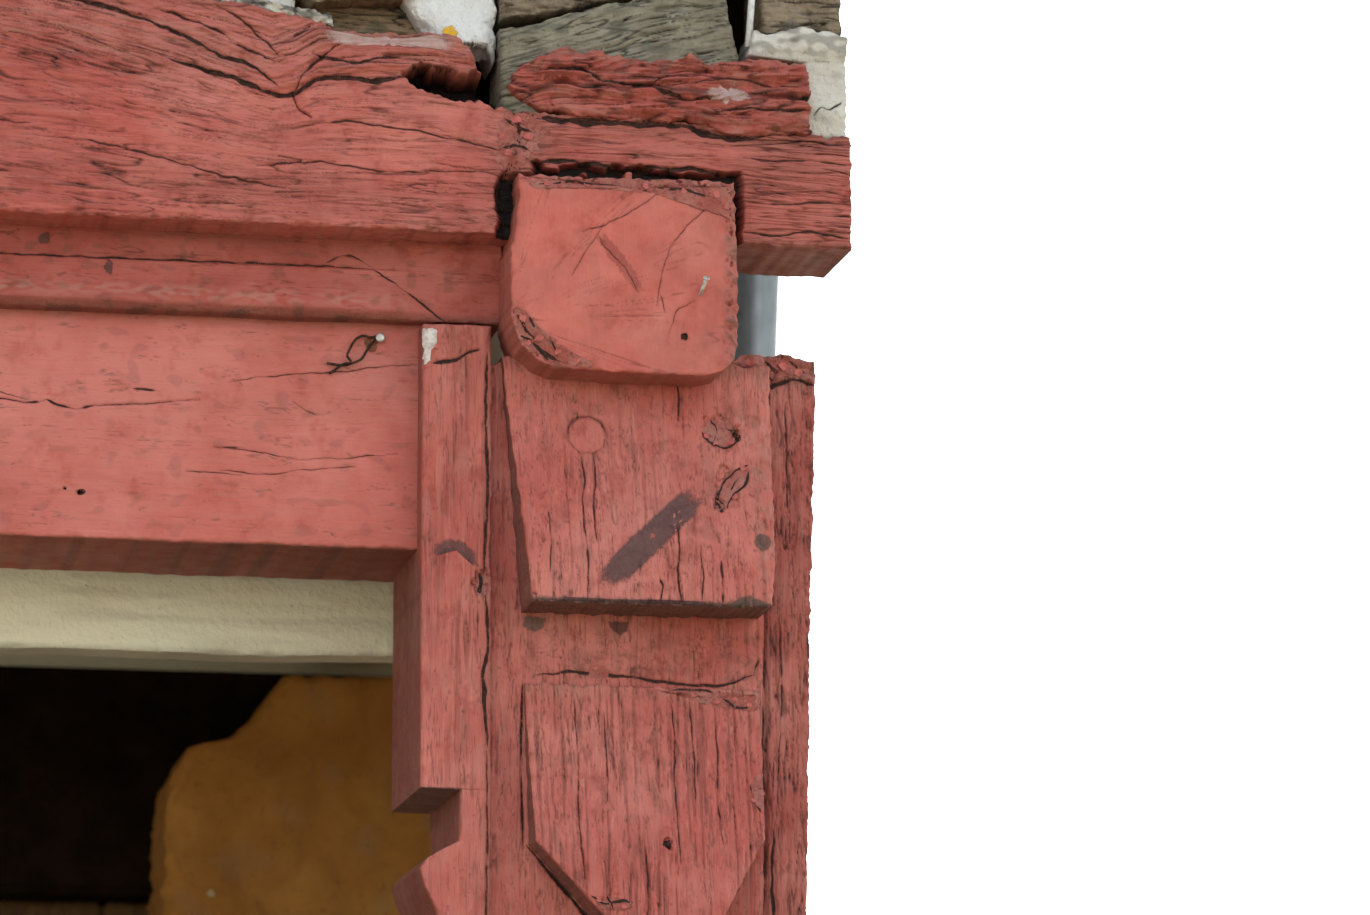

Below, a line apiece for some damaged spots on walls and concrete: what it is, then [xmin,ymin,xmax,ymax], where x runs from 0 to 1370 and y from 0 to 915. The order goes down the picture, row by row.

crack [69,0,849,322]
crack [0,252,445,322]
crack [0,388,186,408]
crack [194,447,390,475]
crack [231,349,489,915]
crack [538,623,783,875]
crack [643,850,651,915]